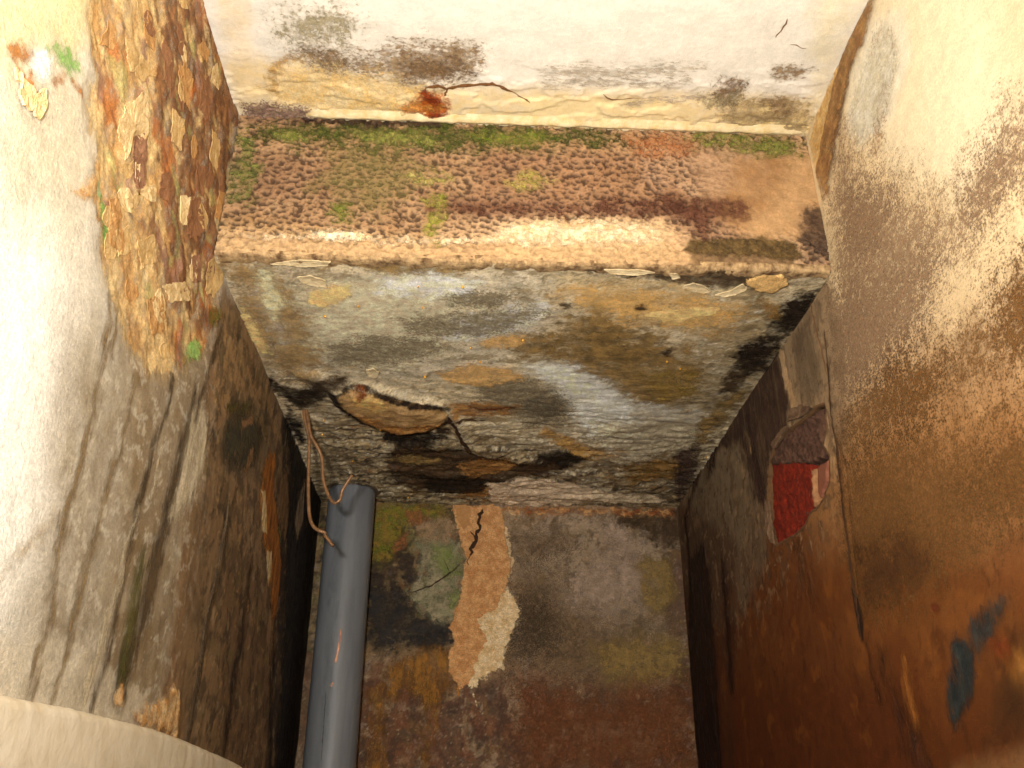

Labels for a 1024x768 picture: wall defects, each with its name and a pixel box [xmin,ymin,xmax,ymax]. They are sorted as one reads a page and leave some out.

damp [267,4,484,128]
rust [401,89,451,123]
flaking render [74,0,873,376]
crack [425,82,530,103]
damp [28,384,98,699]
damp [82,320,223,708]
crack [409,509,484,593]
crack [447,417,504,460]
flaking render [382,442,666,714]
damp [219,82,1024,768]
flaking render [764,385,831,547]
crack [810,303,863,642]